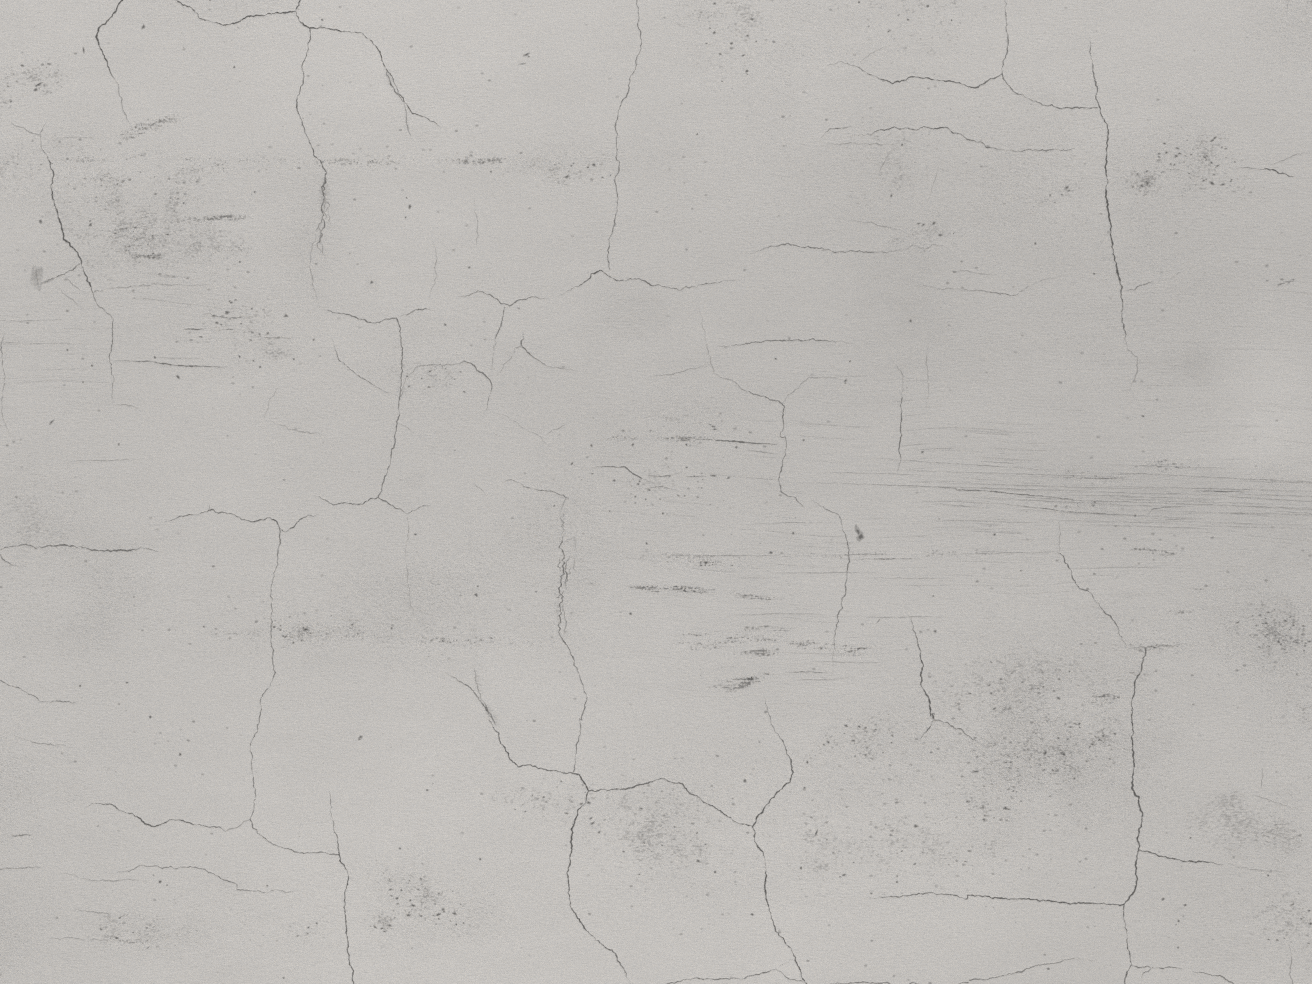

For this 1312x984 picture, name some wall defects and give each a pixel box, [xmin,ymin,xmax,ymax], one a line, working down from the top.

crack [0,0,853,984]
crack [749,219,1063,298]
crack [894,333,931,476]
crack [819,0,1185,392]
crack [1238,149,1312,179]
crack [444,478,1291,984]